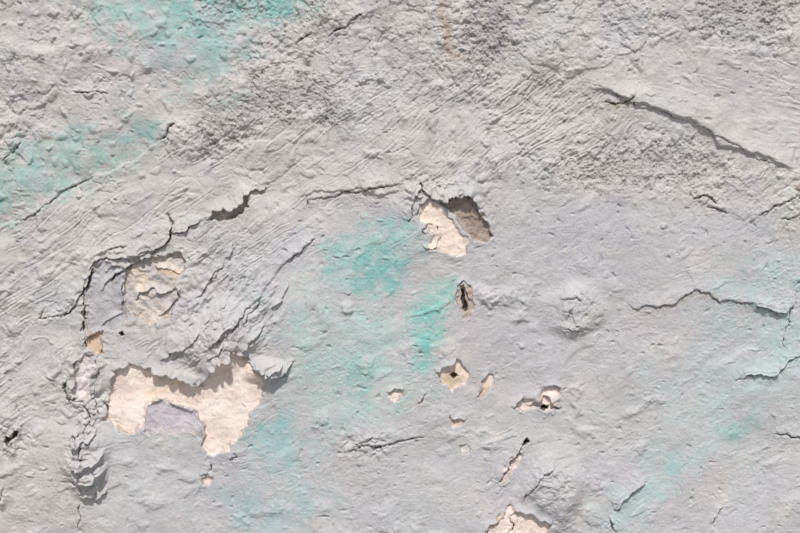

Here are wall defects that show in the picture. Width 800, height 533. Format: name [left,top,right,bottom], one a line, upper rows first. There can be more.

crack [606,93,673,118]
crack [24,178,92,221]
crack [250,183,266,191]
crack [307,183,463,233]
flaking render [409,182,496,257]
flaking render [450,274,475,320]
flaking render [66,235,265,455]
crack [208,300,260,348]
crack [641,282,800,380]
flaking render [434,356,494,400]
flaking render [510,379,563,411]
flaking render [483,502,552,533]